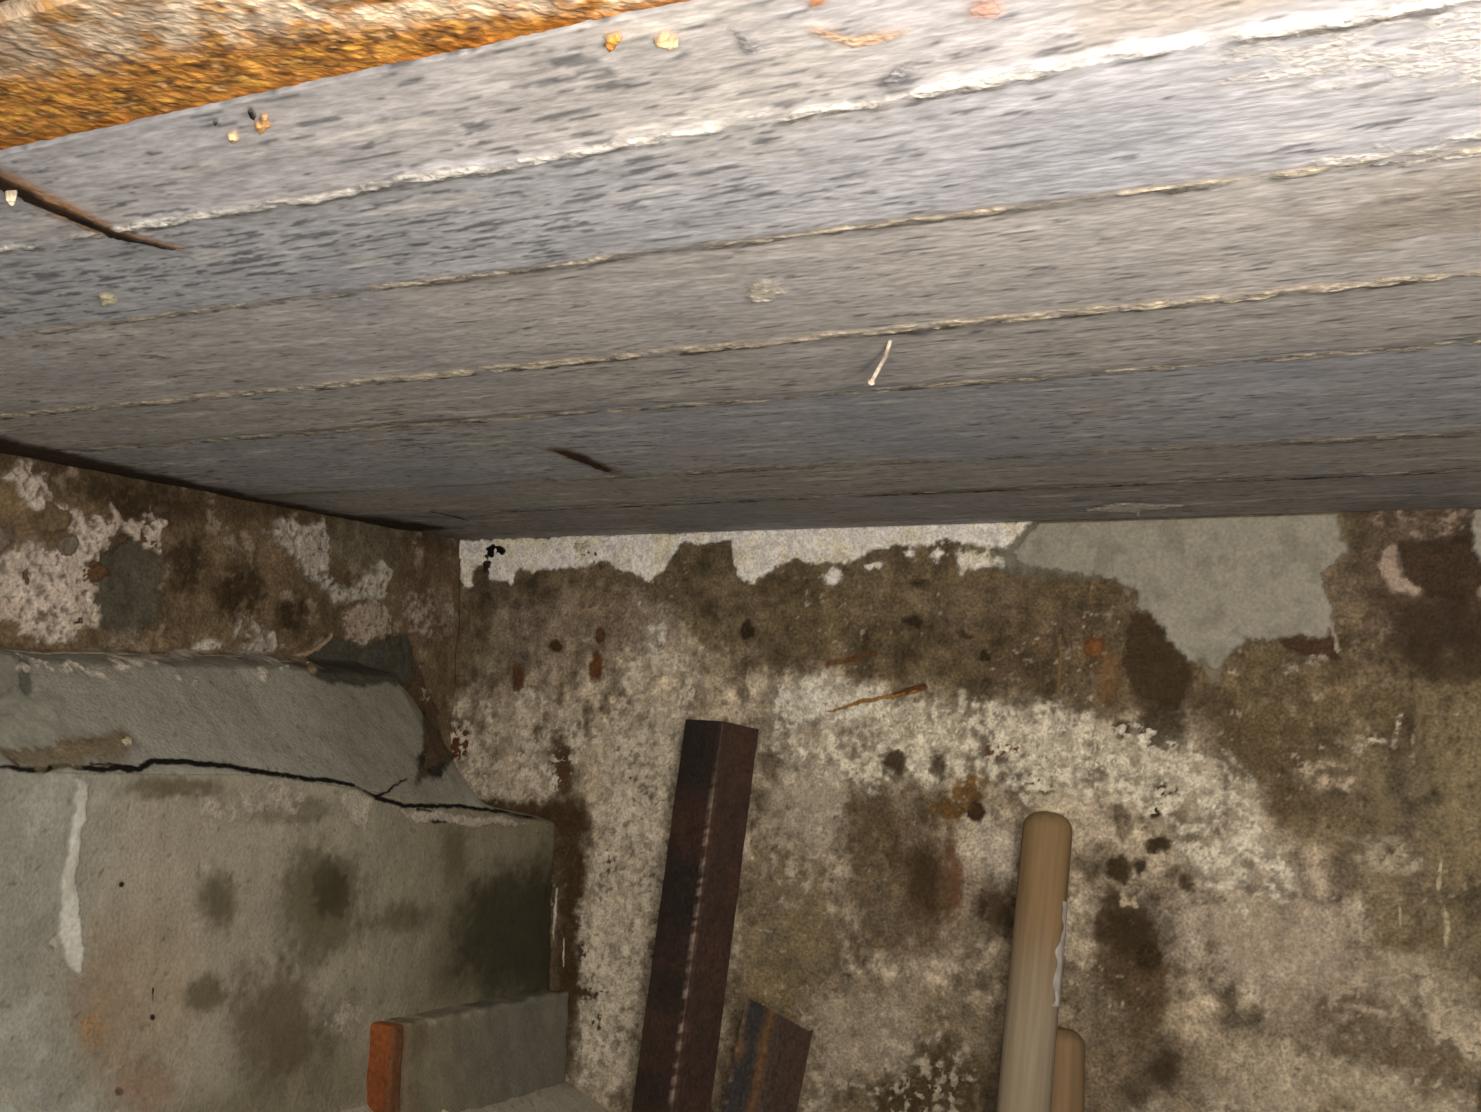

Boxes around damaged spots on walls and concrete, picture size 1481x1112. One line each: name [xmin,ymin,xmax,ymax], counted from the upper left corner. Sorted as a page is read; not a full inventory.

water stain [0,438,446,531]
water stain [35,503,79,556]
water stain [219,569,262,616]
water stain [1399,533,1481,597]
water stain [741,619,755,639]
crack [0,654,31,696]
crack [0,749,535,823]
water stain [759,613,1481,1062]
water stain [285,849,360,956]
water stain [801,1004,985,1112]
water stain [1149,1051,1179,1087]
water stain [1307,1048,1481,1112]